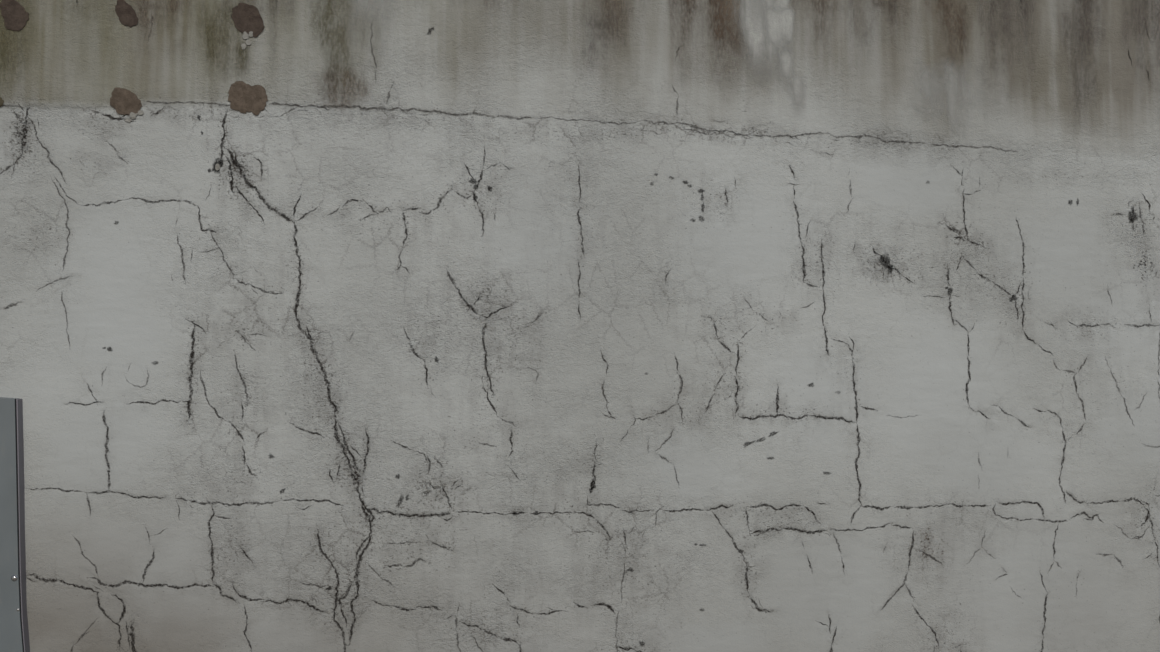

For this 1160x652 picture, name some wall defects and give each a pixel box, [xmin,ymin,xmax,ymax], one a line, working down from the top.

crack [262,27,483,117]
damp [741,0,804,105]
crack [4,101,769,652]
crack [707,166,1160,652]